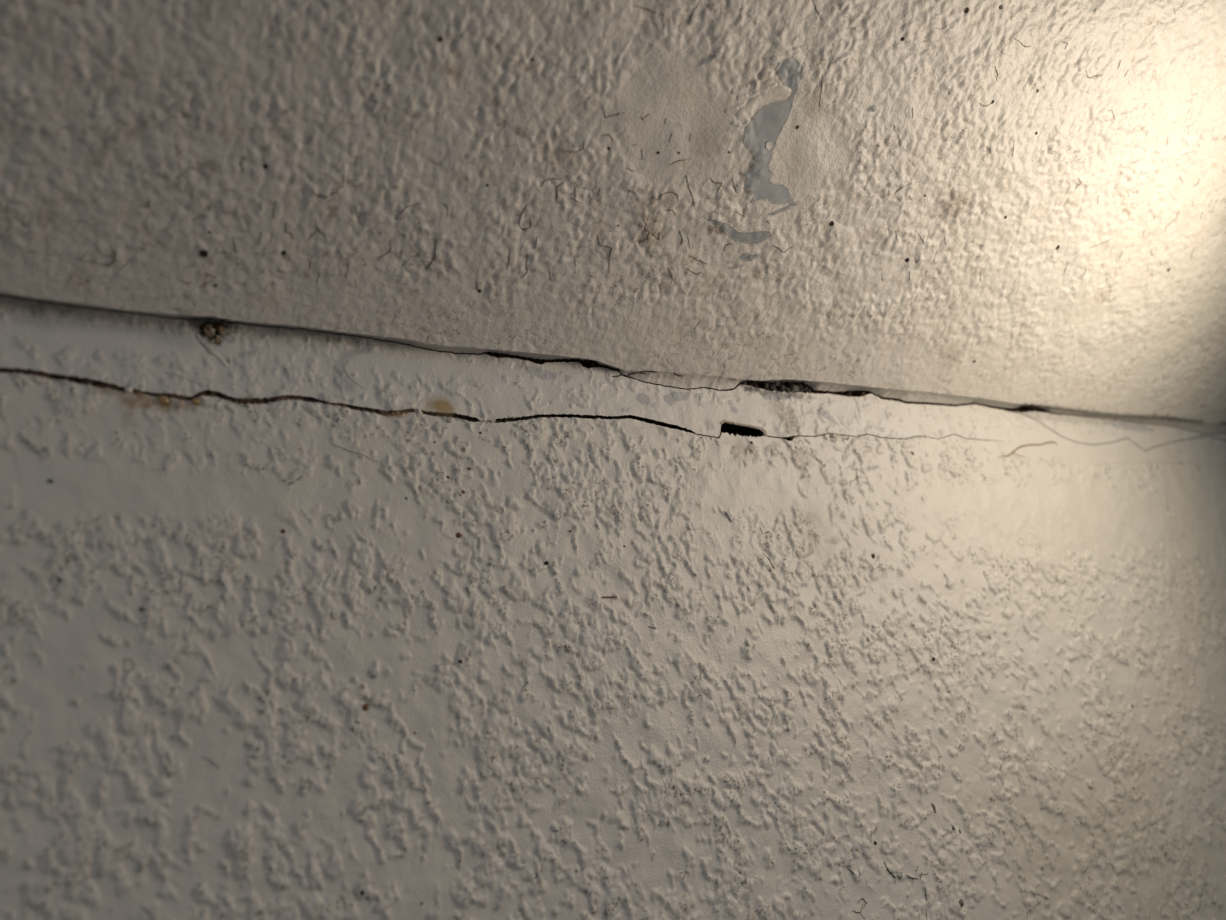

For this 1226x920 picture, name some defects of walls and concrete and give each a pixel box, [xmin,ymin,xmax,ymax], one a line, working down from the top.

peeling [740,56,804,215]
peeling [705,217,772,262]
crack [0,294,1226,458]